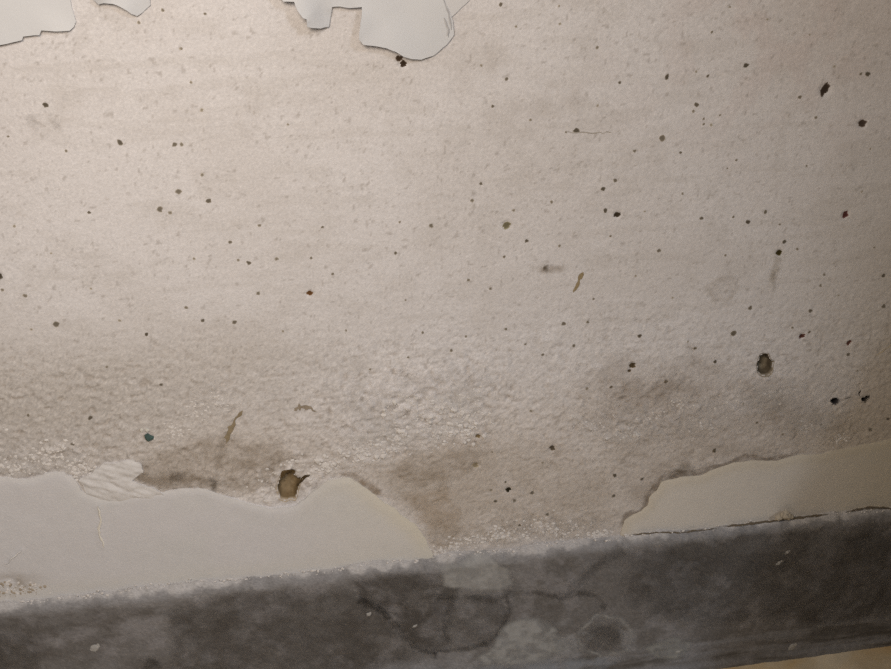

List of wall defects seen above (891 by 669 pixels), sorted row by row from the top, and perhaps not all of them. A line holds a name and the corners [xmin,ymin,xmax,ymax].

peeling [0,0,76,45]
peeling [283,0,469,67]
spalling [224,411,243,443]
damp [314,378,496,474]
flaking render [0,453,433,601]
damp [431,509,613,590]
flaking render [621,439,891,536]
damp [479,614,633,669]